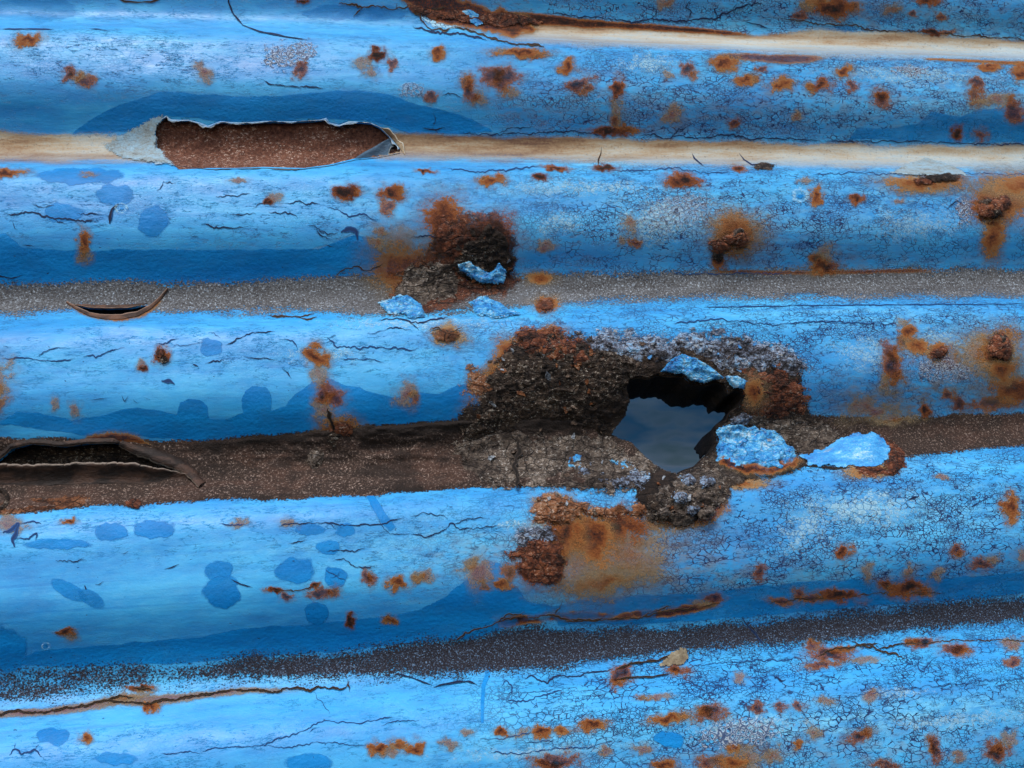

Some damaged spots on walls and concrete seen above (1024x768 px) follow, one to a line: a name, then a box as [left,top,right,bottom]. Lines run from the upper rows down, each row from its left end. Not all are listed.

rust [460,0,1024,124]
rust [154,56,1024,262]
rust [364,184,606,405]
peeling [661,354,748,389]
rust [809,318,1024,458]
rust [0,335,731,611]
spalling [568,454,677,518]
peeling [716,412,798,470]
crack [771,592,940,604]
crack [501,617,1024,705]
rust [803,638,879,671]
crack [0,682,418,755]